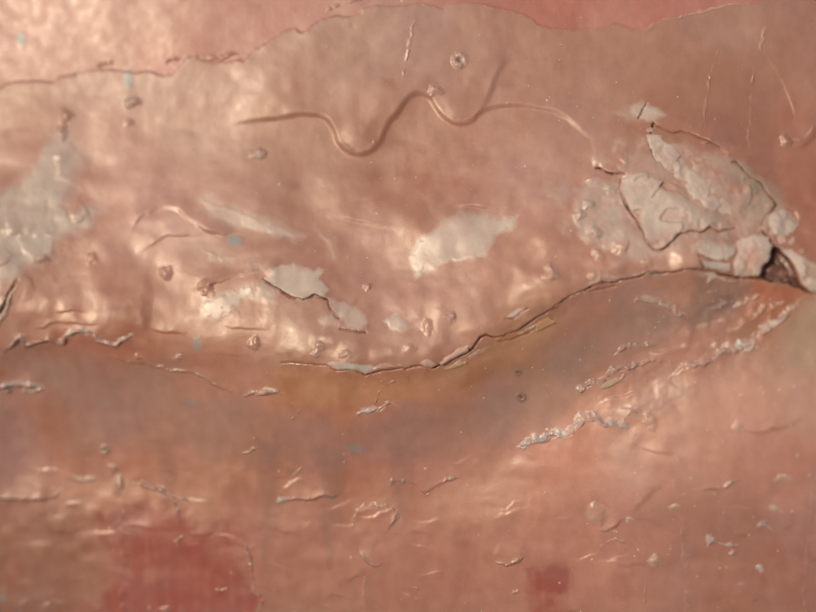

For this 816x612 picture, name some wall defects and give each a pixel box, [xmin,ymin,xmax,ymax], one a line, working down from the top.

peeling [1,0,766,88]
peeling [0,123,111,287]
peeling [195,194,341,263]
peeling [408,206,521,282]
crack [595,167,736,251]
crack [0,280,19,326]
peeling [0,326,285,398]
peeling [186,240,370,334]
crack [263,279,366,333]
peeling [382,312,415,334]
crack [281,254,816,376]
peeling [514,98,816,486]